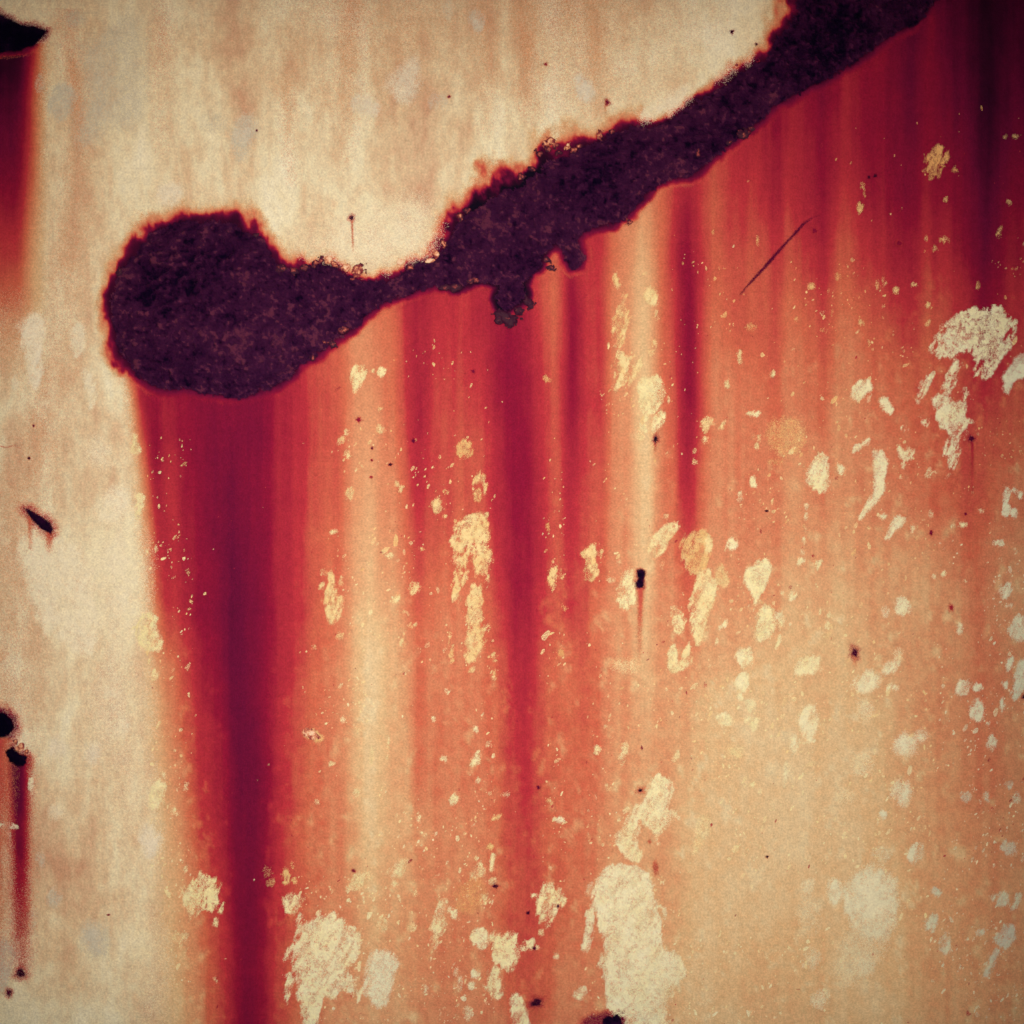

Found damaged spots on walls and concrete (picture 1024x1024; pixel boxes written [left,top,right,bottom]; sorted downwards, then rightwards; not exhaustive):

rust [0,7,54,399]
peeling [915,303,1024,478]
peeling [431,470,499,681]
peeling [646,514,729,675]
rust [0,702,41,999]
peeling [172,866,224,958]
peeling [263,862,401,1024]
peeling [580,773,687,1024]